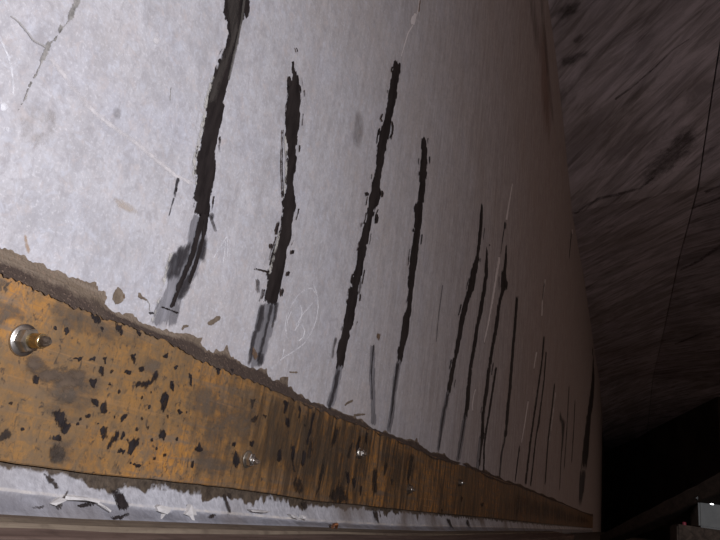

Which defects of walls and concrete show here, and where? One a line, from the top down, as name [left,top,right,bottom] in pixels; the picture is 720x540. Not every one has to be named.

peeling [112,287,125,304]
peeling [125,353,168,375]
peeling [91,398,128,422]
peeling [49,495,111,512]
peeling [154,504,172,519]
peeling [183,504,197,520]